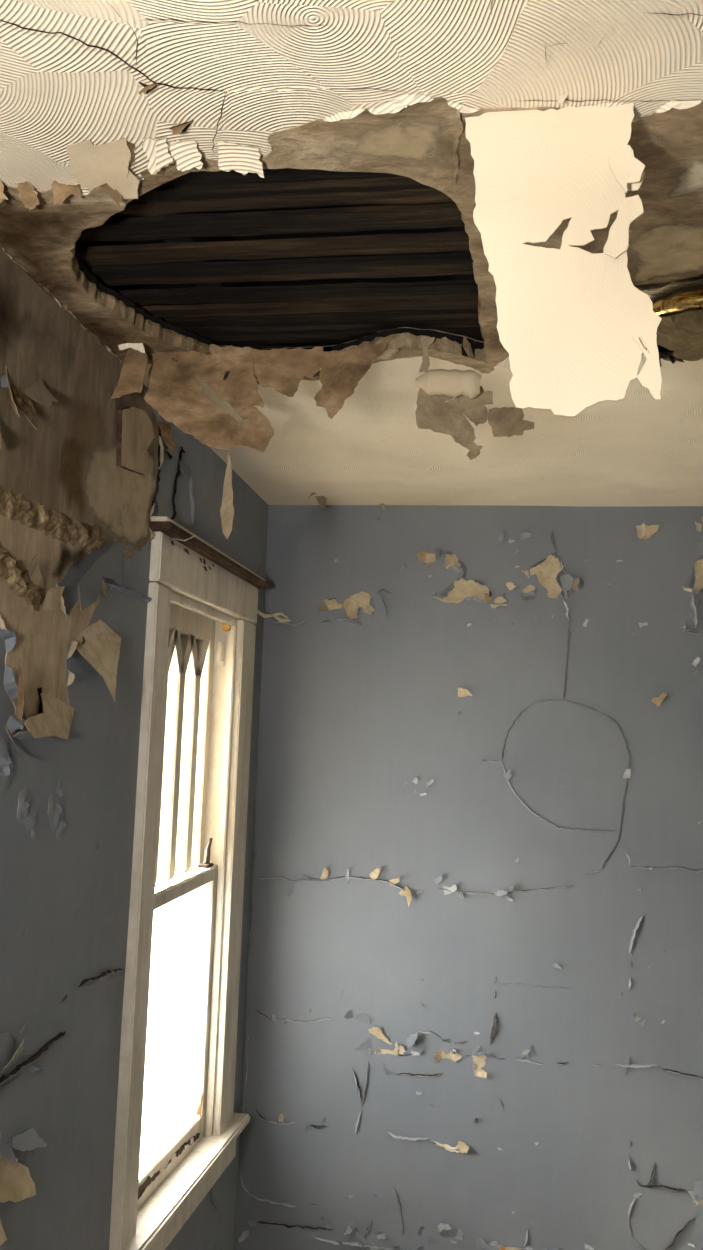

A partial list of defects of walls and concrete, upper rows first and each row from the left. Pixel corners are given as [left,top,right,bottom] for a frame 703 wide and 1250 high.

crack [648,11,703,19]
crack [0,0,398,155]
crack [514,97,700,105]
peeling [524,99,703,291]
peeling [0,94,584,762]
peeling [636,523,660,540]
peeling [682,512,703,594]
crack [252,531,703,907]
crack [0,968,123,1086]
peeling [344,1009,496,1078]
peeling [0,1128,47,1204]